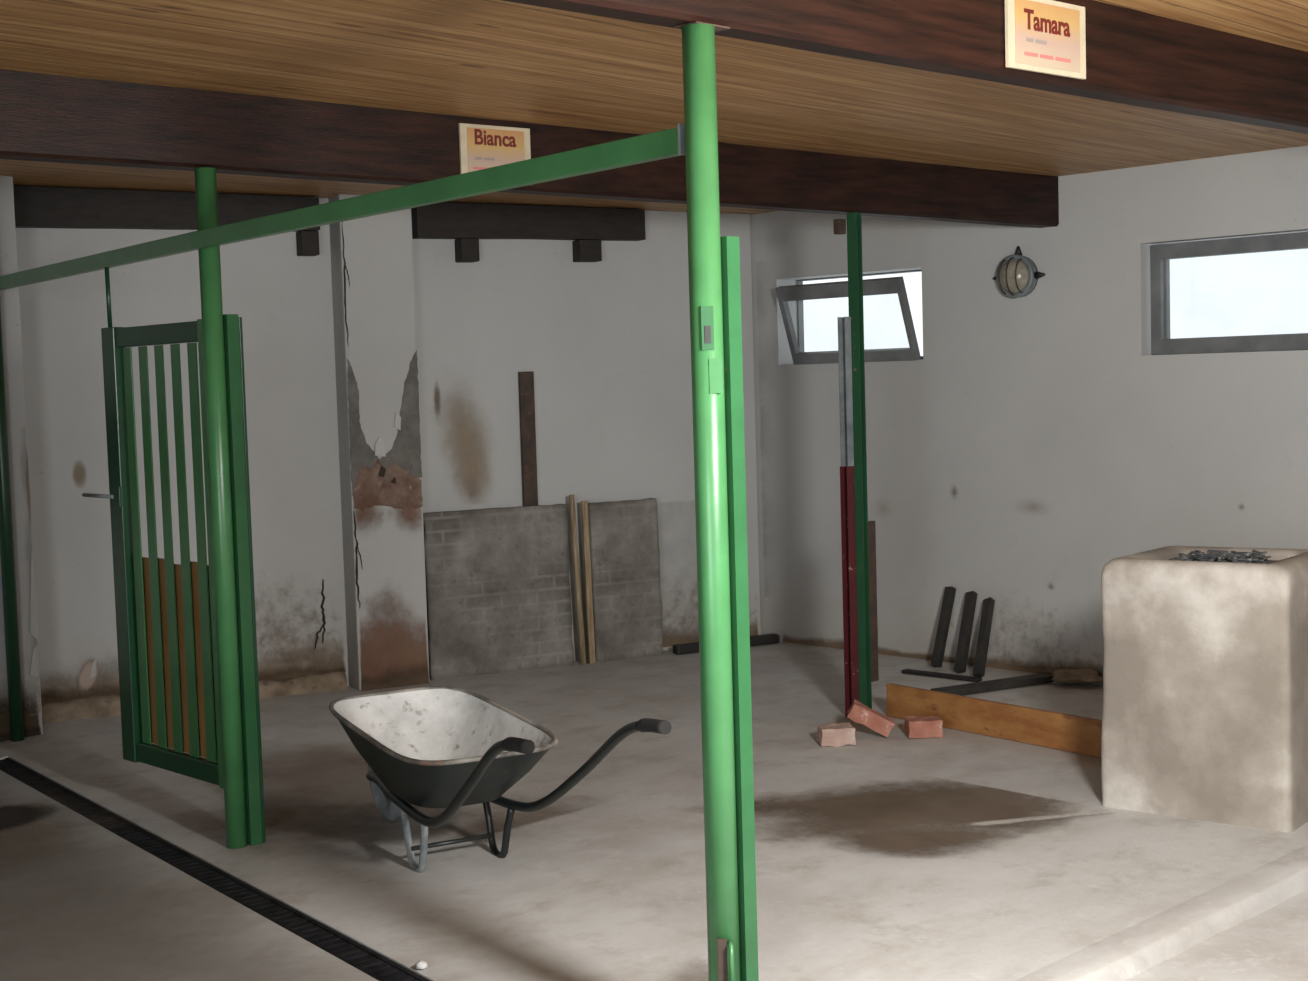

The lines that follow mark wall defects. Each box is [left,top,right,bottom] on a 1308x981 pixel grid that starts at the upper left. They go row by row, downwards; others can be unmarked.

flaking render [347,350,423,523]
damp [258,650,345,681]
damp [361,609,429,691]
damp [0,675,120,742]
damp [754,783,1111,855]